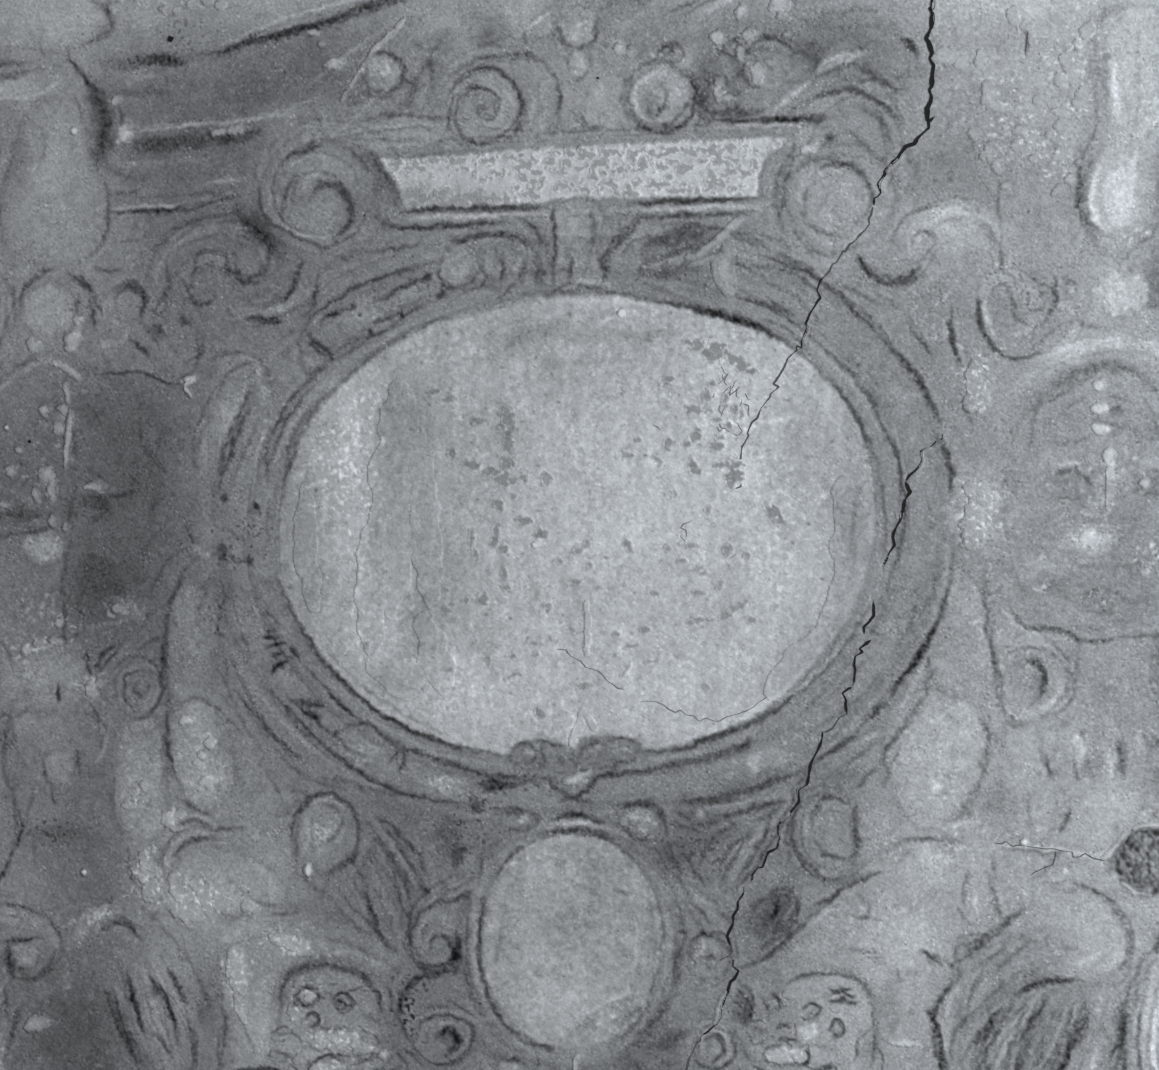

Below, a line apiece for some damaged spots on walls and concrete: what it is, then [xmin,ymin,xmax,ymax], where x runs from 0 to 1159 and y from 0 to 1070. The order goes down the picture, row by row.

flaking render [708,2,779,88]
flaking render [712,79,741,105]
peeling [378,136,820,211]
crack [736,0,940,489]
peeling [613,334,761,492]
peeling [555,537,595,588]
peeling [621,536,637,556]
peeling [662,520,726,598]
peeling [761,501,789,527]
crack [880,432,943,568]
crack [686,595,875,1070]
crack [996,841,1107,874]